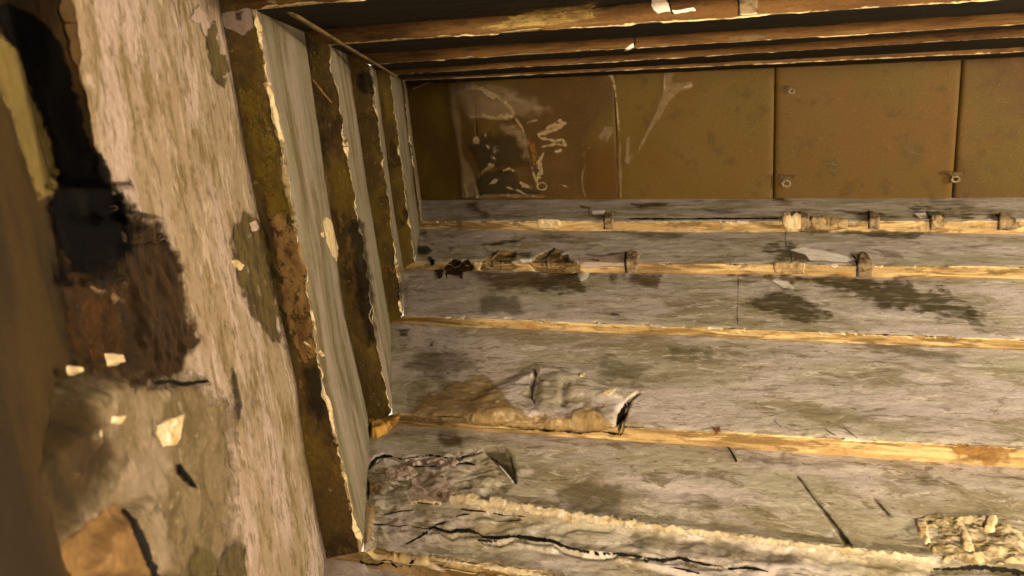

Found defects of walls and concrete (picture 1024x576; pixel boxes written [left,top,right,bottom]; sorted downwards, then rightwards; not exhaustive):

water stain [450,83,567,217]
spalling [0,36,200,386]
water stain [764,275,901,287]
crack [155,378,209,386]
spalling [411,375,590,432]
spalling [370,457,459,506]
spalling [484,446,517,483]
crack [360,454,768,574]
crack [799,478,852,548]
peeling [916,521,931,545]
peeling [958,530,975,552]
peeling [983,515,998,533]